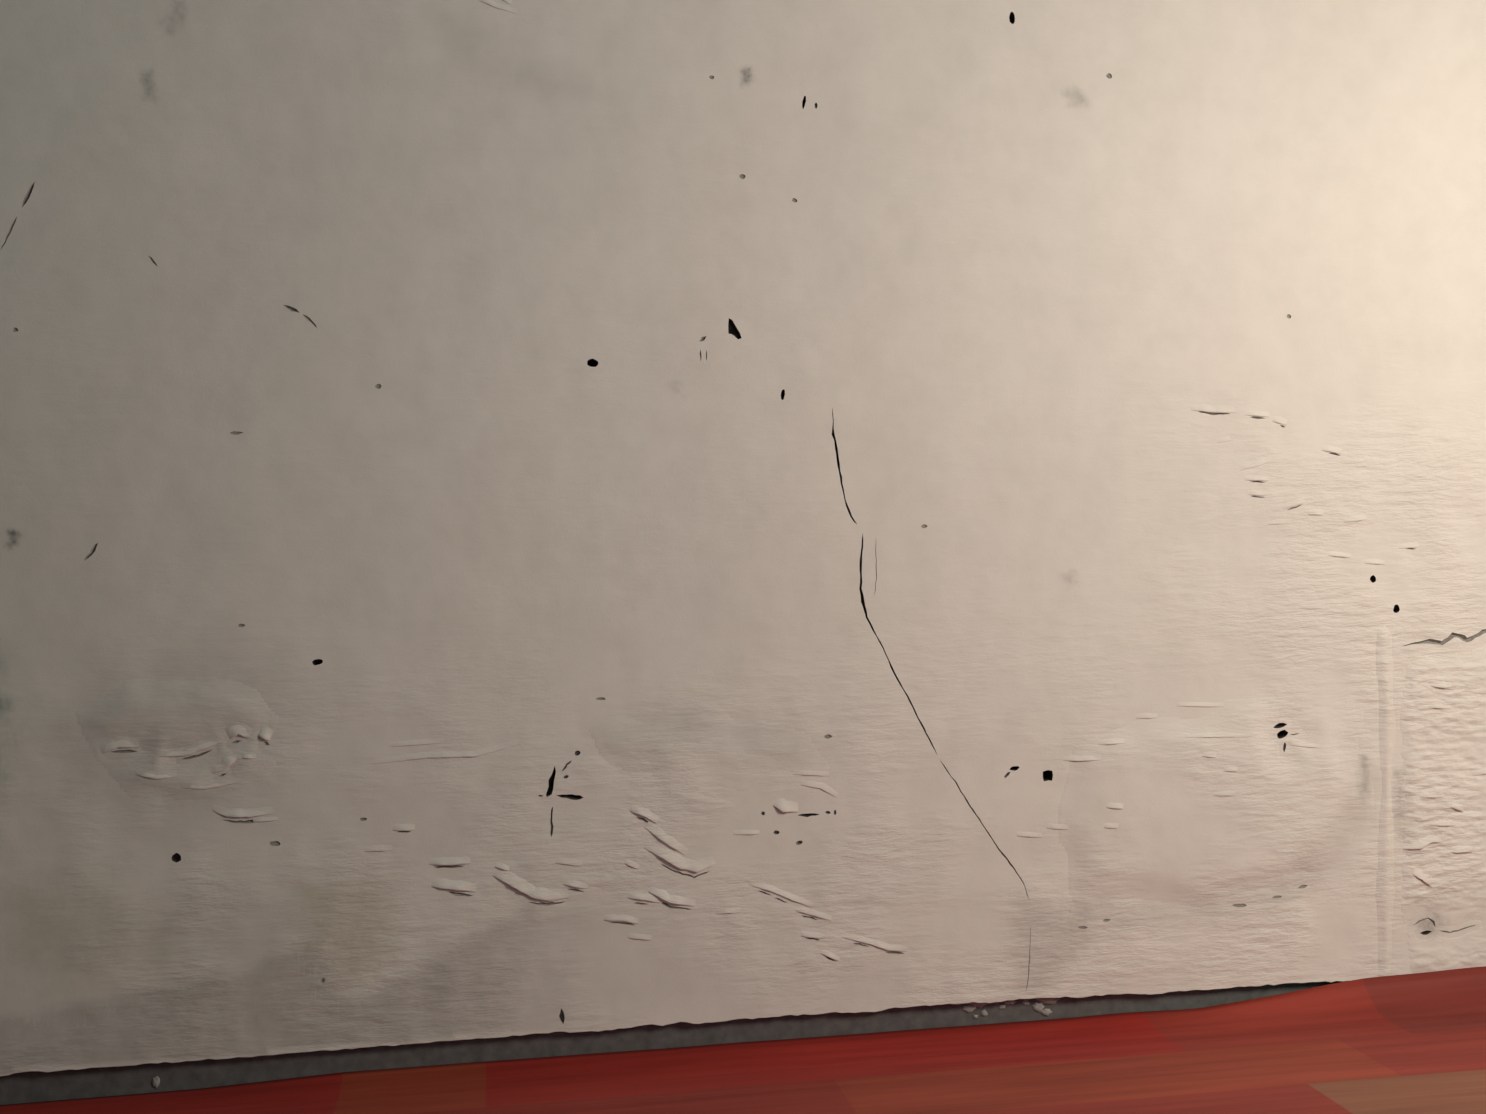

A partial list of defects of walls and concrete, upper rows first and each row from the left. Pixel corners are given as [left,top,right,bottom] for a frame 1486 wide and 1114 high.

crack [832,407,1031,989]
crack [1404,629,1486,646]